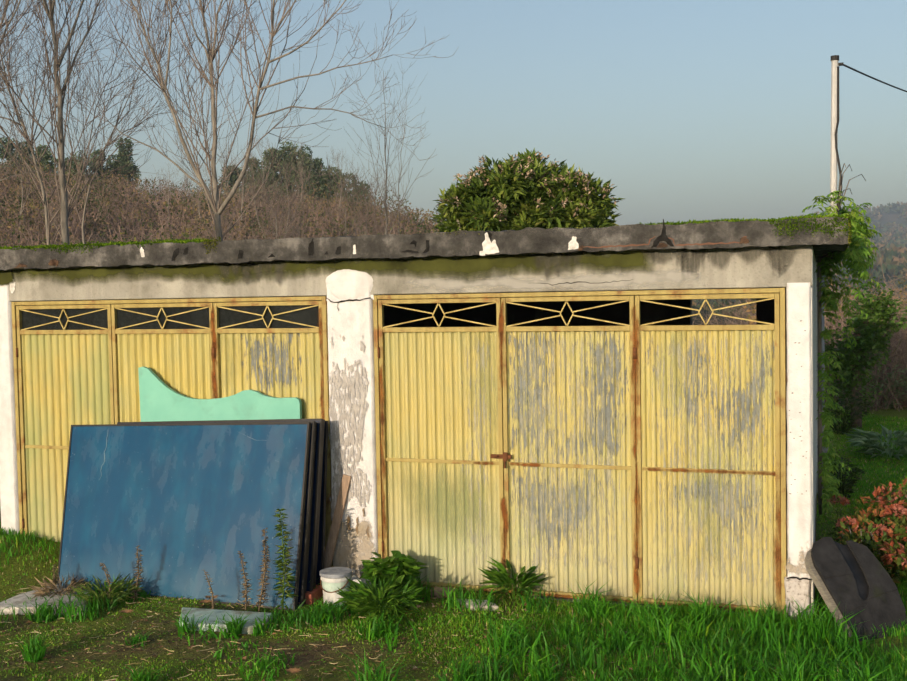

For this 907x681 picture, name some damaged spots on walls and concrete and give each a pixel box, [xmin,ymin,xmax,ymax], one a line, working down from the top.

crack [541,278,633,286]
damp [413,249,795,289]
peeling [241,333,302,392]
peeling [328,335,375,578]
peeling [508,331,630,574]
peeling [645,330,775,587]
rust [600,568,644,603]